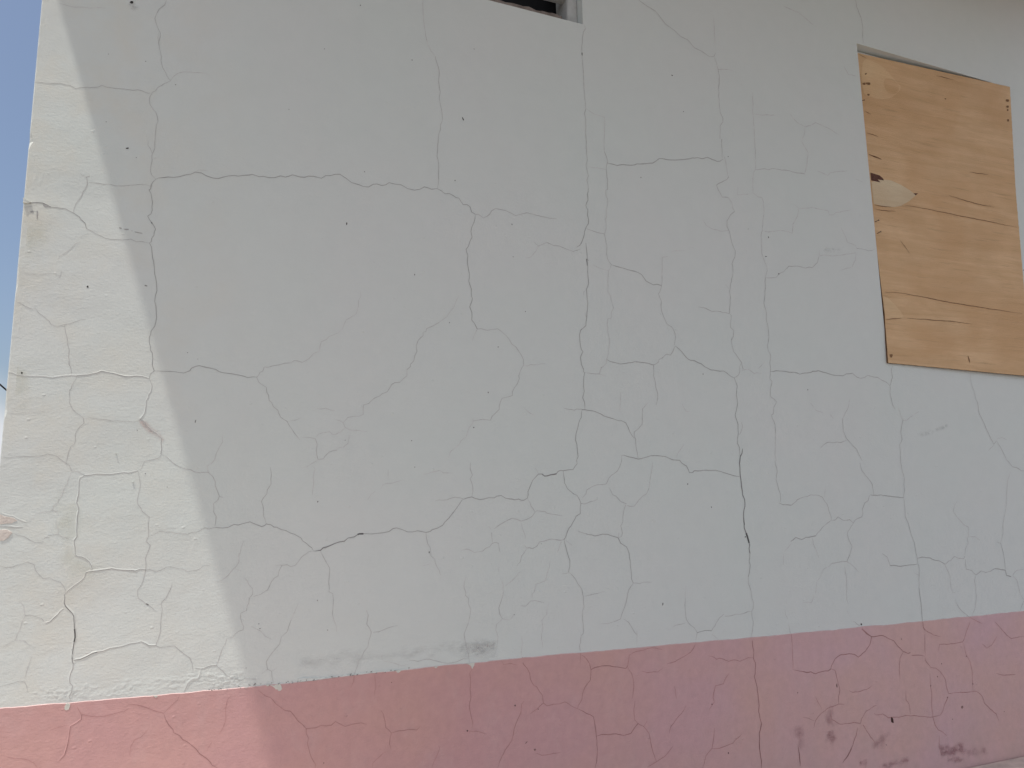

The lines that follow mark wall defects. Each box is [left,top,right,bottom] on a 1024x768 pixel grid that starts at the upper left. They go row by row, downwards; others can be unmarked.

crack [1,1,763,768]
crack [764,297,893,446]
crack [775,395,918,603]
crack [796,502,1024,762]